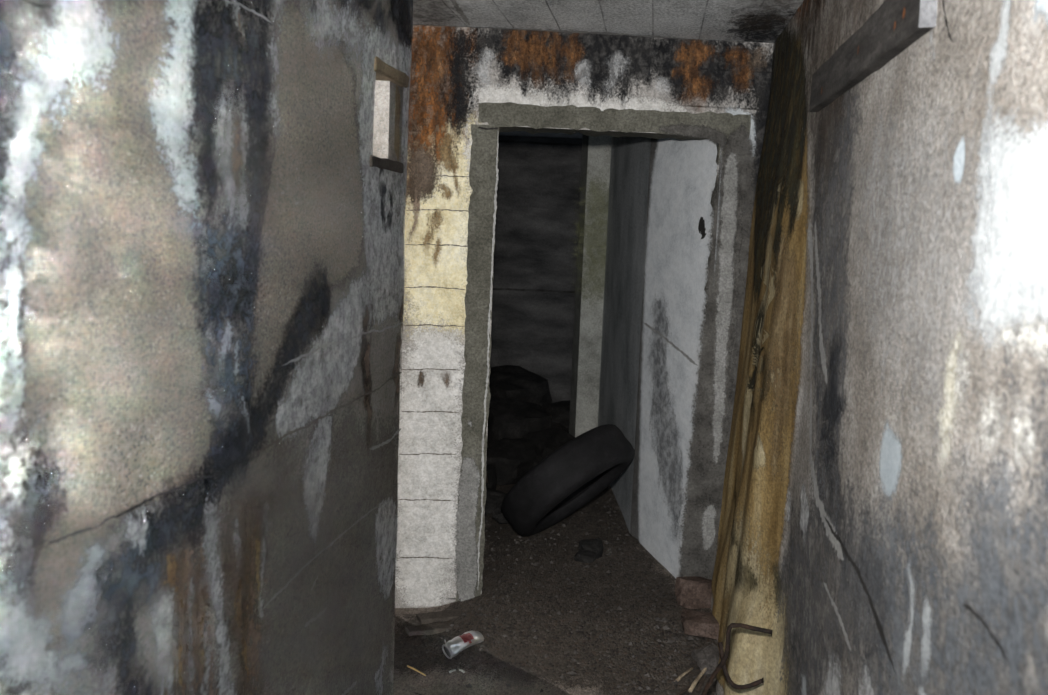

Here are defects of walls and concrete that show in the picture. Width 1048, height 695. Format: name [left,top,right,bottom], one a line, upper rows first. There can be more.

leakage [146,0,285,372]
leakage [305,0,457,73]
rust [406,25,480,261]
crack [450,0,470,25]
rust [672,41,767,102]
crack [37,368,459,550]
leakage [362,301,374,410]
crack [282,127,499,585]
leakage [651,0,1048,695]
crack [806,216,895,672]
crack [963,604,1008,662]